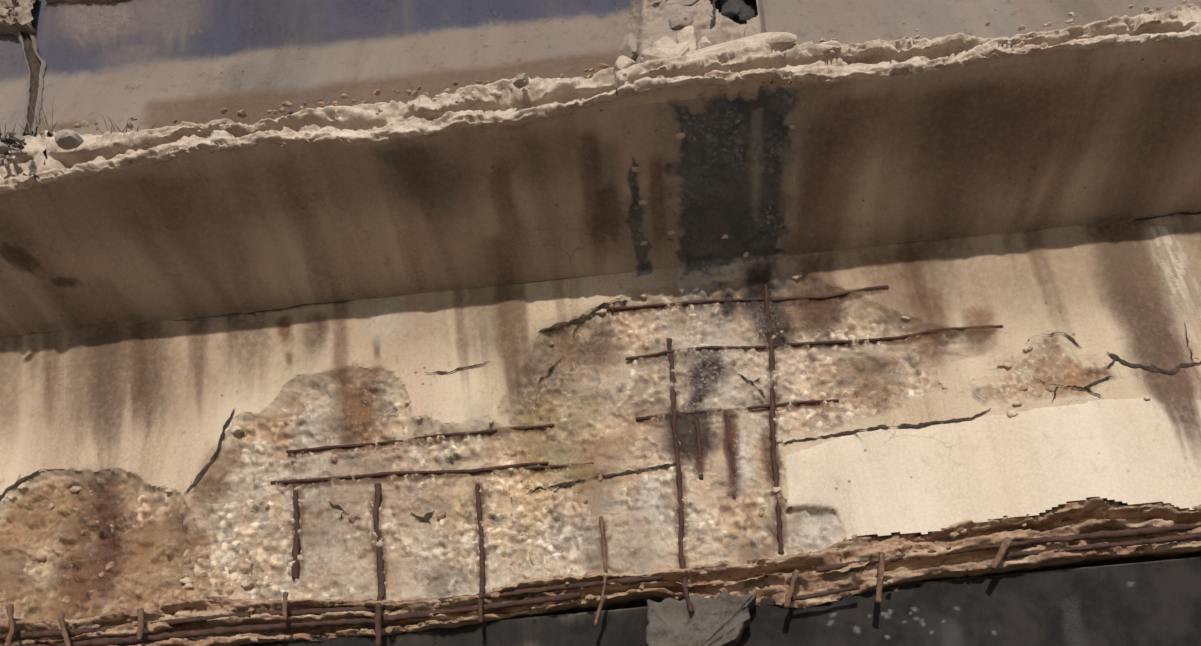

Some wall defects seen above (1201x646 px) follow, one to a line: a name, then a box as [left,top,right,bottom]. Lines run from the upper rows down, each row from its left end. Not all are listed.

crack [17,31,46,135]
spalling [0,5,1201,293]
crack [0,468,44,499]
spalling [0,468,375,642]
crack [181,406,235,495]
spalling [109,624,376,646]
spalling [183,362,639,636]
rust [284,464,576,573]
rust [605,264,991,559]
spalling [497,271,1201,610]
crack [1035,322,1201,402]
leakage [1097,220,1200,435]